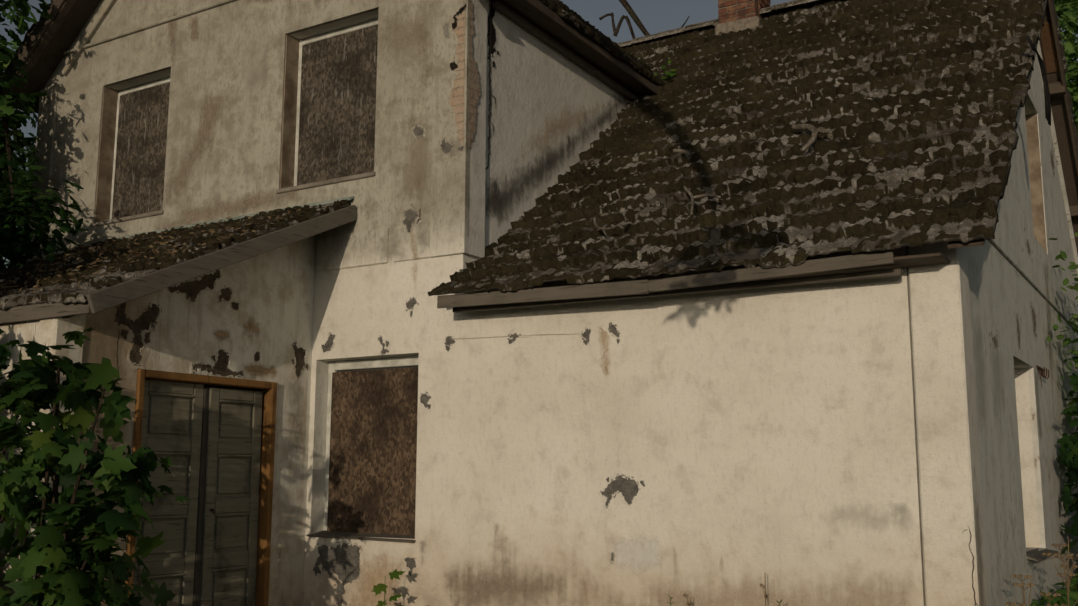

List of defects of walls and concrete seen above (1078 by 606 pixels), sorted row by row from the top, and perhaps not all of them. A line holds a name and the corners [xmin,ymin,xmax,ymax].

flaking render [408,0,499,160]
crack [485,0,496,170]
spalling [111,268,239,373]
spalling [186,344,263,379]
spalling [289,328,339,380]
spalling [442,332,460,351]
spalling [504,326,524,348]
spalling [576,316,625,349]
spalling [596,467,646,511]
spalling [311,538,366,606]
water stain [450,571,553,606]
crack [963,528,978,606]